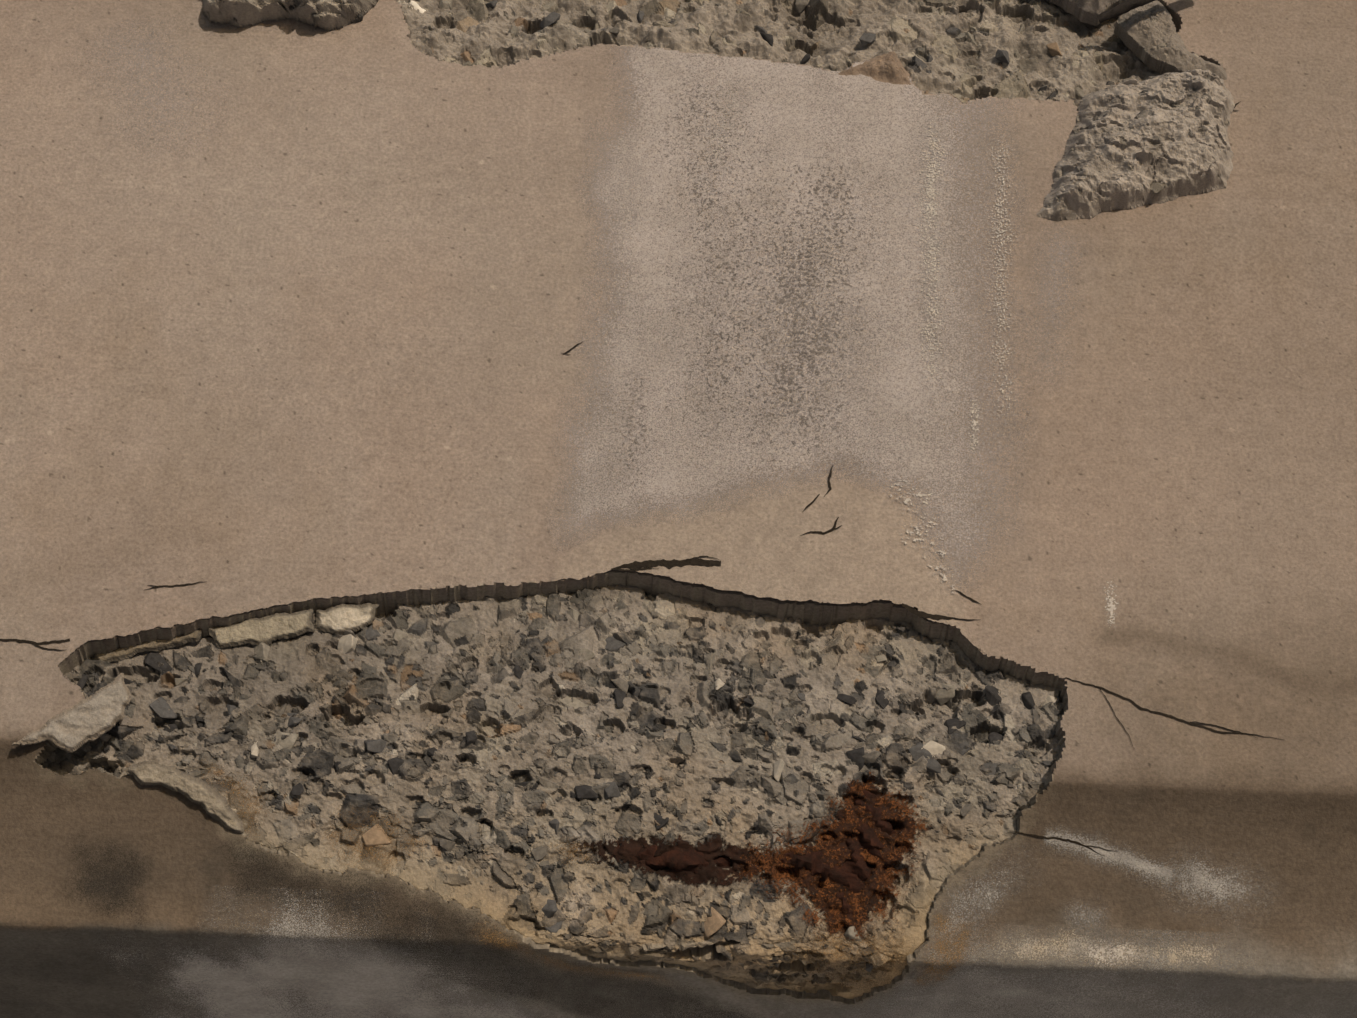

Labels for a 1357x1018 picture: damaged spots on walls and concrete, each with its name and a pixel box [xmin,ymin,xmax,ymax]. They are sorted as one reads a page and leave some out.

spalling [202,0,379,31]
spalling [396,0,1235,222]
leakage [554,45,1079,592]
crack [0,638,70,651]
spalling [12,584,1063,999]
crack [611,556,721,572]
leakage [103,828,1357,1018]
corrosion [551,771,931,991]
crack [802,465,842,535]
crack [1065,677,1283,748]